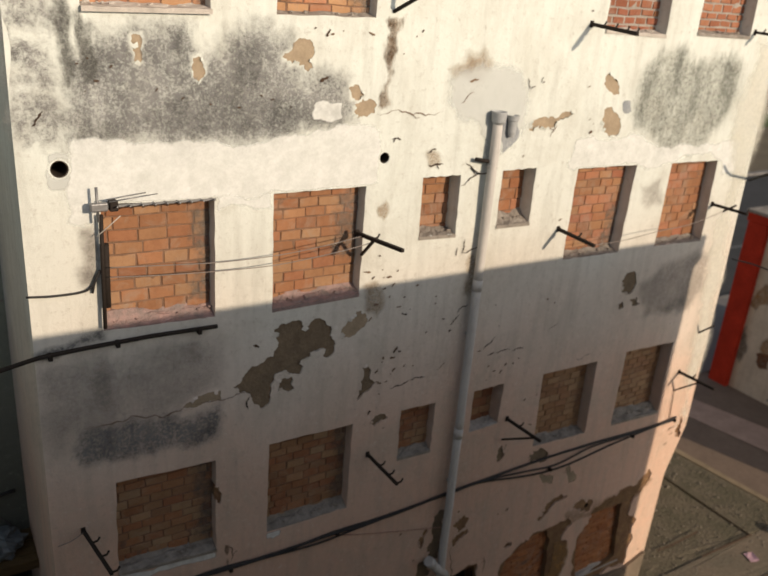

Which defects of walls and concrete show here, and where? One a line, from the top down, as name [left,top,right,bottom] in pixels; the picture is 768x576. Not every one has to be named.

damp [11,0,351,144]
flaking render [282,38,315,72]
crack [382,110,438,119]
flaking render [529,109,576,132]
flaking render [589,107,621,138]
flaking render [604,72,619,95]
mould [640,52,741,149]
flaking render [234,310,372,408]
crack [84,392,249,430]
mould [77,412,219,464]
flaking render [412,510,444,576]
spalling [498,470,651,576]